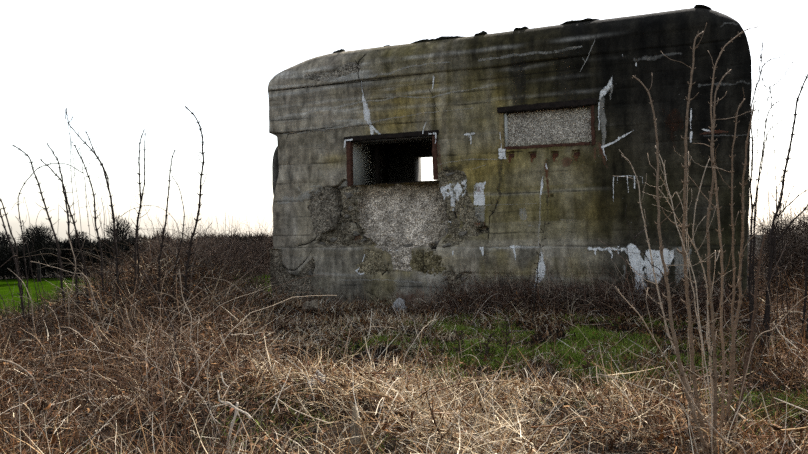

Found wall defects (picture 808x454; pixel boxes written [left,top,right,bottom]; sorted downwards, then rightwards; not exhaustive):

damp [361,81,380,135]
damp [598,77,612,130]
damp [440,180,467,211]
spalling [307,169,489,277]
damp [535,253,546,282]
damp [588,243,674,295]